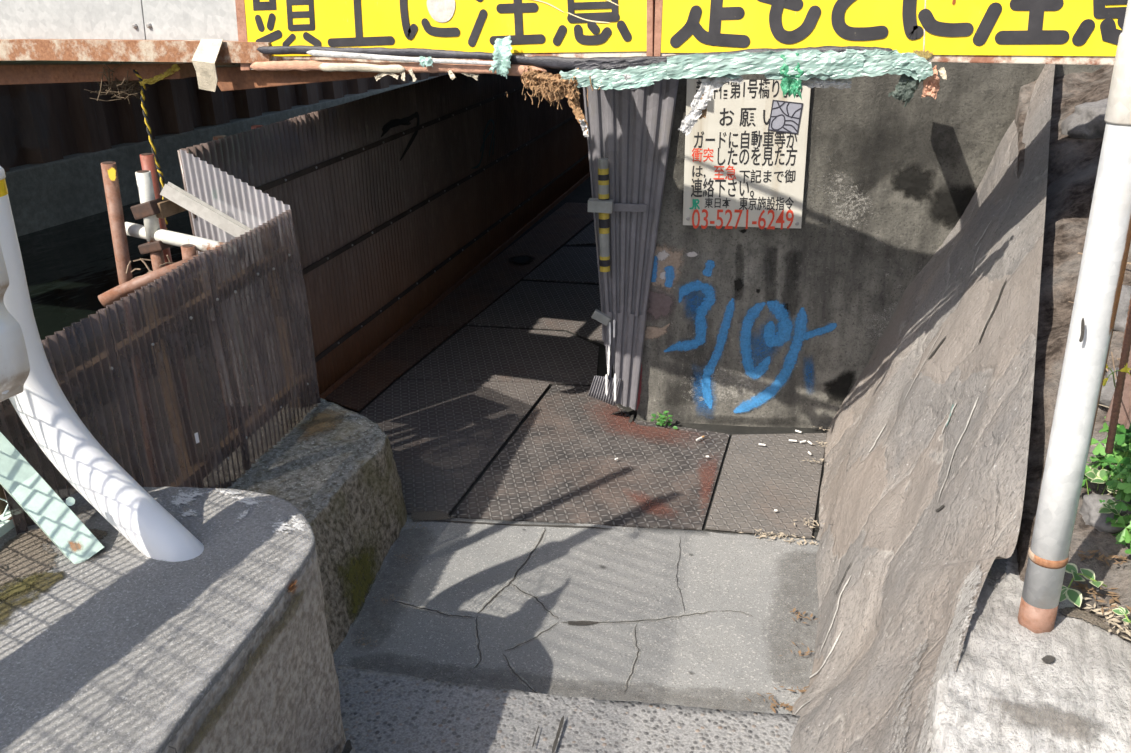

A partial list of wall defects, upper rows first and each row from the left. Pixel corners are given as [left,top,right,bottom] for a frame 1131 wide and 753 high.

water stain [825,130,977,232]
crack [391,528,752,693]